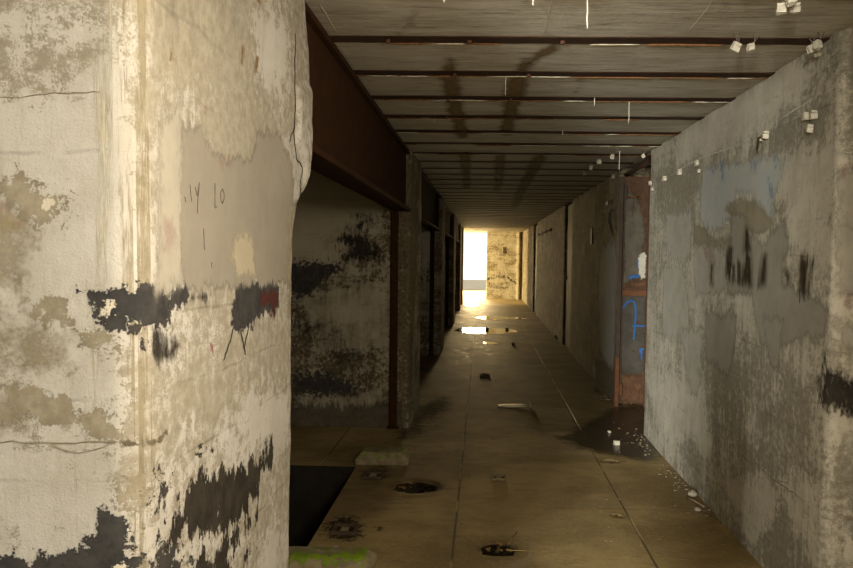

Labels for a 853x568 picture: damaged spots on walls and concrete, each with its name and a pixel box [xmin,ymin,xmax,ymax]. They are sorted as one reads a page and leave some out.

peeling [137,0,146,118]
crack [0,90,96,98]
crack [290,33,303,203]
damp [337,213,385,268]
damp [0,326,59,369]
peeling [0,133,274,568]
crack [0,440,119,453]